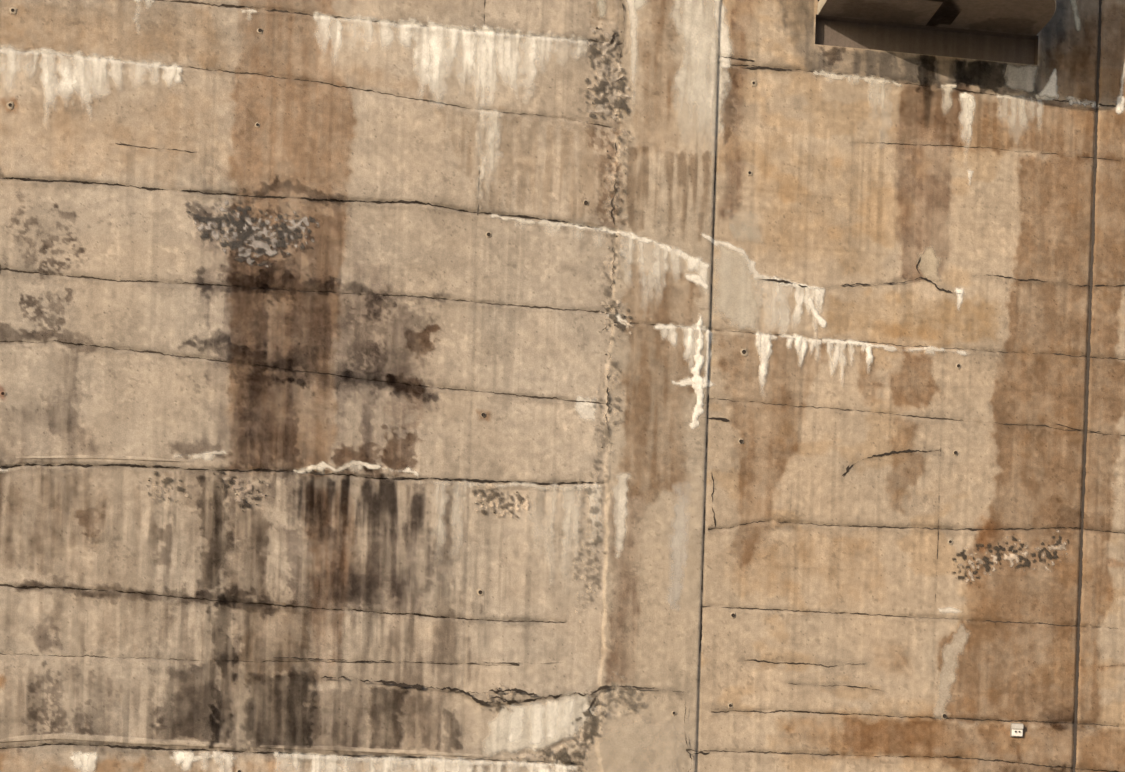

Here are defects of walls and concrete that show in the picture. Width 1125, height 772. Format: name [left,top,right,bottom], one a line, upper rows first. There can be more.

damp [42,50,120,97]
damp [365,19,552,88]
spalling [186,201,319,267]
damp [491,215,895,383]
crack [762,257,962,294]
crack [986,274,1125,287]
damp [655,317,712,429]
damp [294,450,397,520]
crack [842,449,936,477]
spalling [952,530,1069,582]
damp [174,703,233,772]
damp [275,672,336,772]